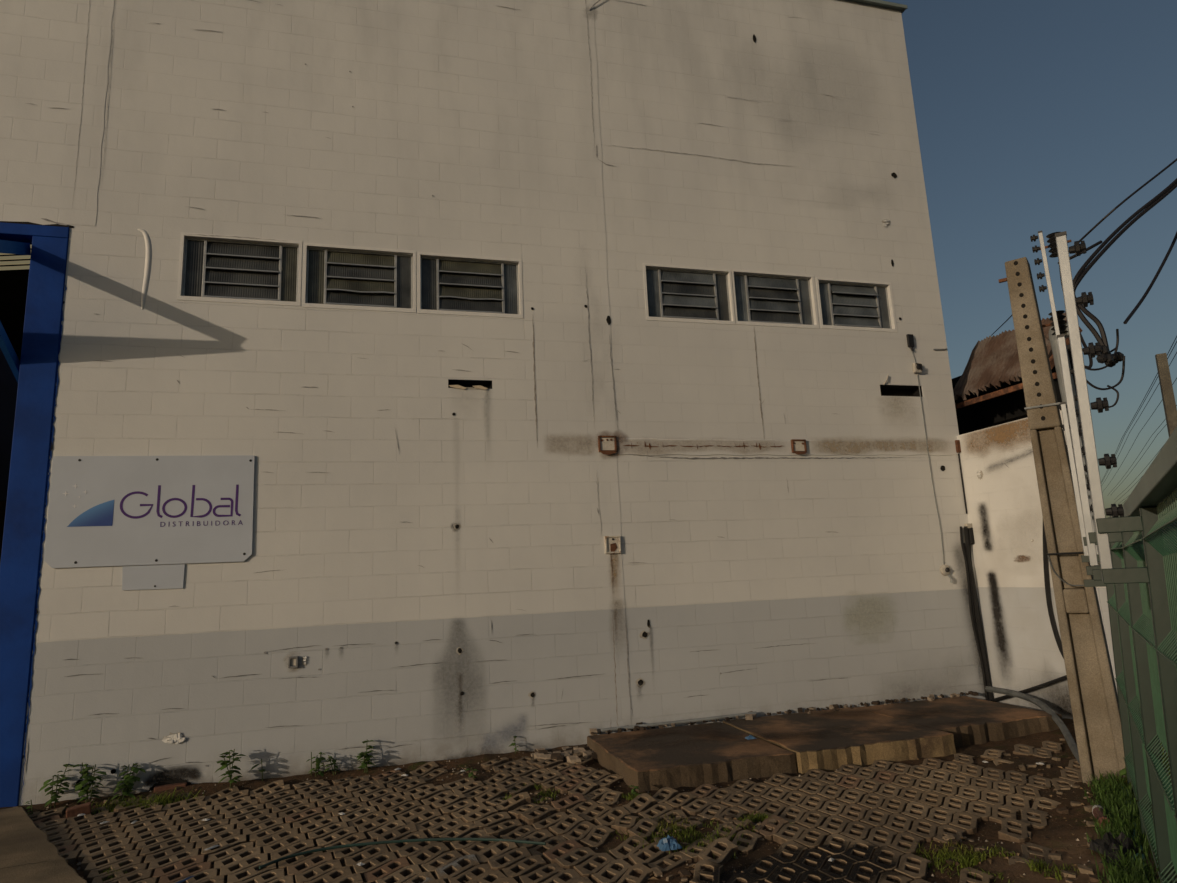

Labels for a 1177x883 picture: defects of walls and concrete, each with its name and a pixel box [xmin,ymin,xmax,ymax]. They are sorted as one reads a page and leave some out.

rust [606,435,781,455]
rust [822,440,933,453]